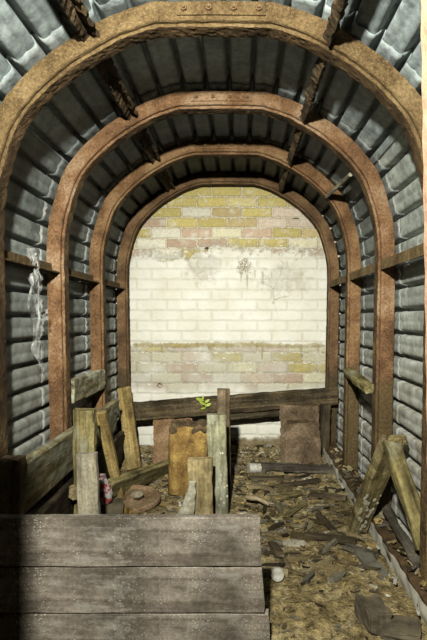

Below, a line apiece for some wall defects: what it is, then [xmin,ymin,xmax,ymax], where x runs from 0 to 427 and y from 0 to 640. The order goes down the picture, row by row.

peeling [131,186,325,260]
peeling [130,346,326,389]